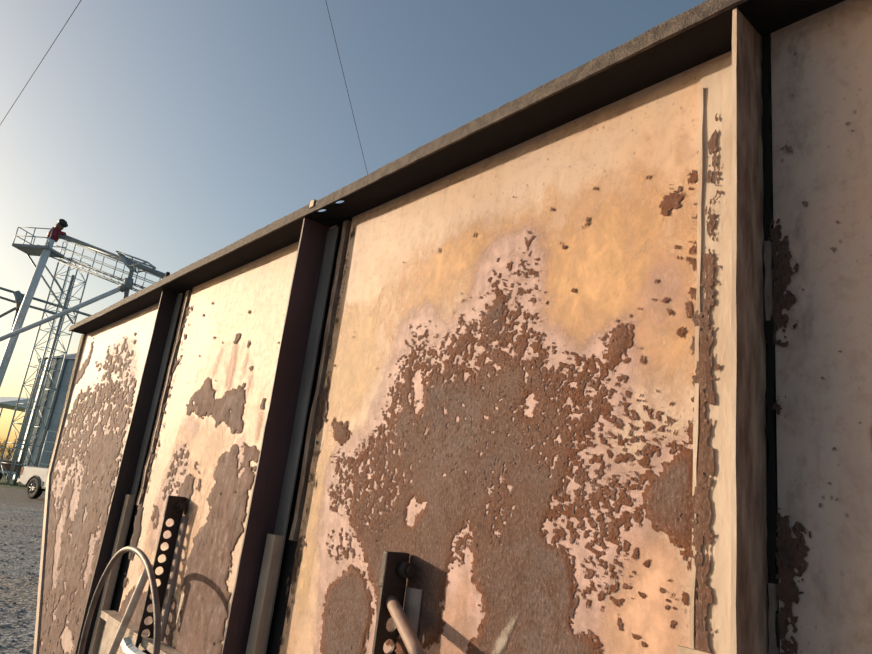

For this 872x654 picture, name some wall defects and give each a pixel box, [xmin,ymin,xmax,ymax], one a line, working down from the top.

peeling [48,341,136,607]
peeling [151,445,189,546]
rust [279,113,721,654]
peeling [315,226,693,654]
rust [764,218,804,347]
rust [775,508,811,654]